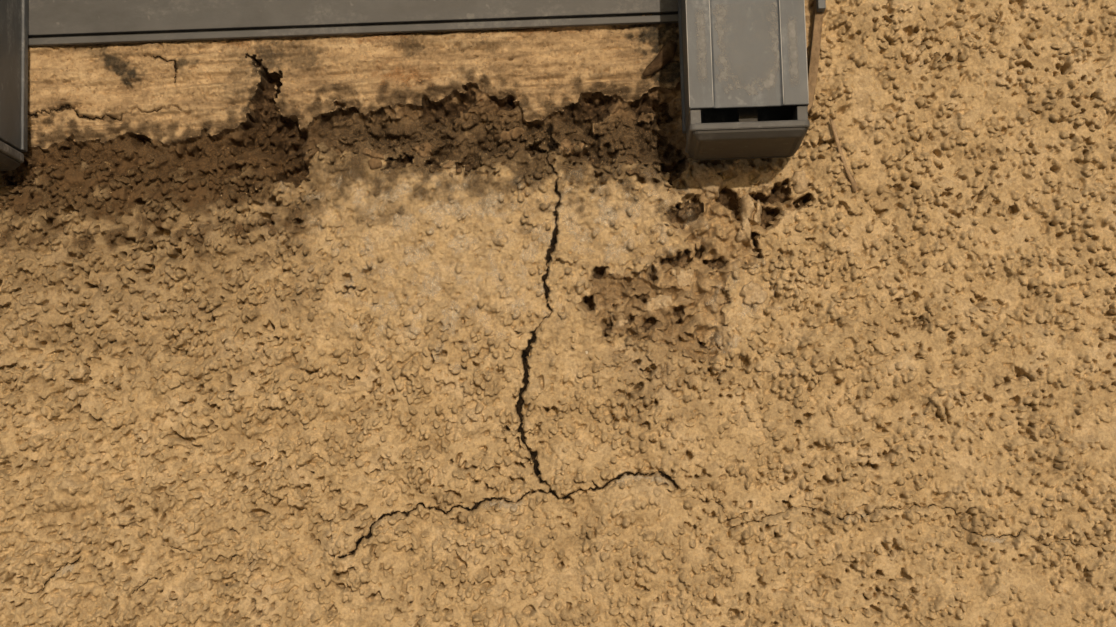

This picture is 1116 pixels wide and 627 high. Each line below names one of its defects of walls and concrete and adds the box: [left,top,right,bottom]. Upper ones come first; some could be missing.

crack [28,55,179,121]
leakage [0,38,320,257]
leakage [275,72,671,261]
leakage [576,23,680,102]
leakage [697,2,798,95]
crack [338,124,1115,558]